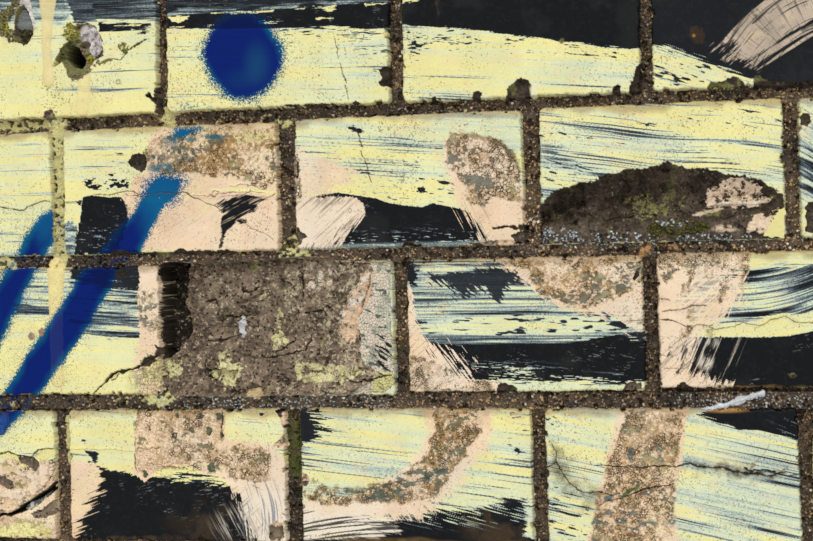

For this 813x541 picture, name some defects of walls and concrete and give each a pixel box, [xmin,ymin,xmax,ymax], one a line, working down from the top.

spalling [0,0,37,46]
spalling [69,51,87,69]
peeling [128,123,303,199]
peeling [443,131,525,211]
spalling [459,223,530,247]
spalling [507,161,786,344]
crack [94,345,178,396]
spalling [110,248,518,484]
peeling [301,405,484,508]
peeling [588,405,690,541]
crack [547,439,799,515]